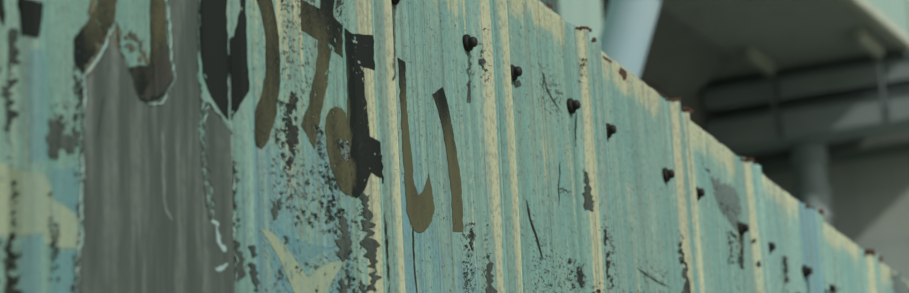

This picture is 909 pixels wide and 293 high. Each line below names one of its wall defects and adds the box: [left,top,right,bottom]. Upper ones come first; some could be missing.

peeling [0,28,21,158]
peeling [0,174,23,293]
peeling [46,0,269,293]
peeling [272,91,382,293]
peeling [534,209,625,293]
peeling [583,171,595,211]
peeling [679,235,691,293]
peeling [703,163,756,269]
peeling [889,269,909,293]